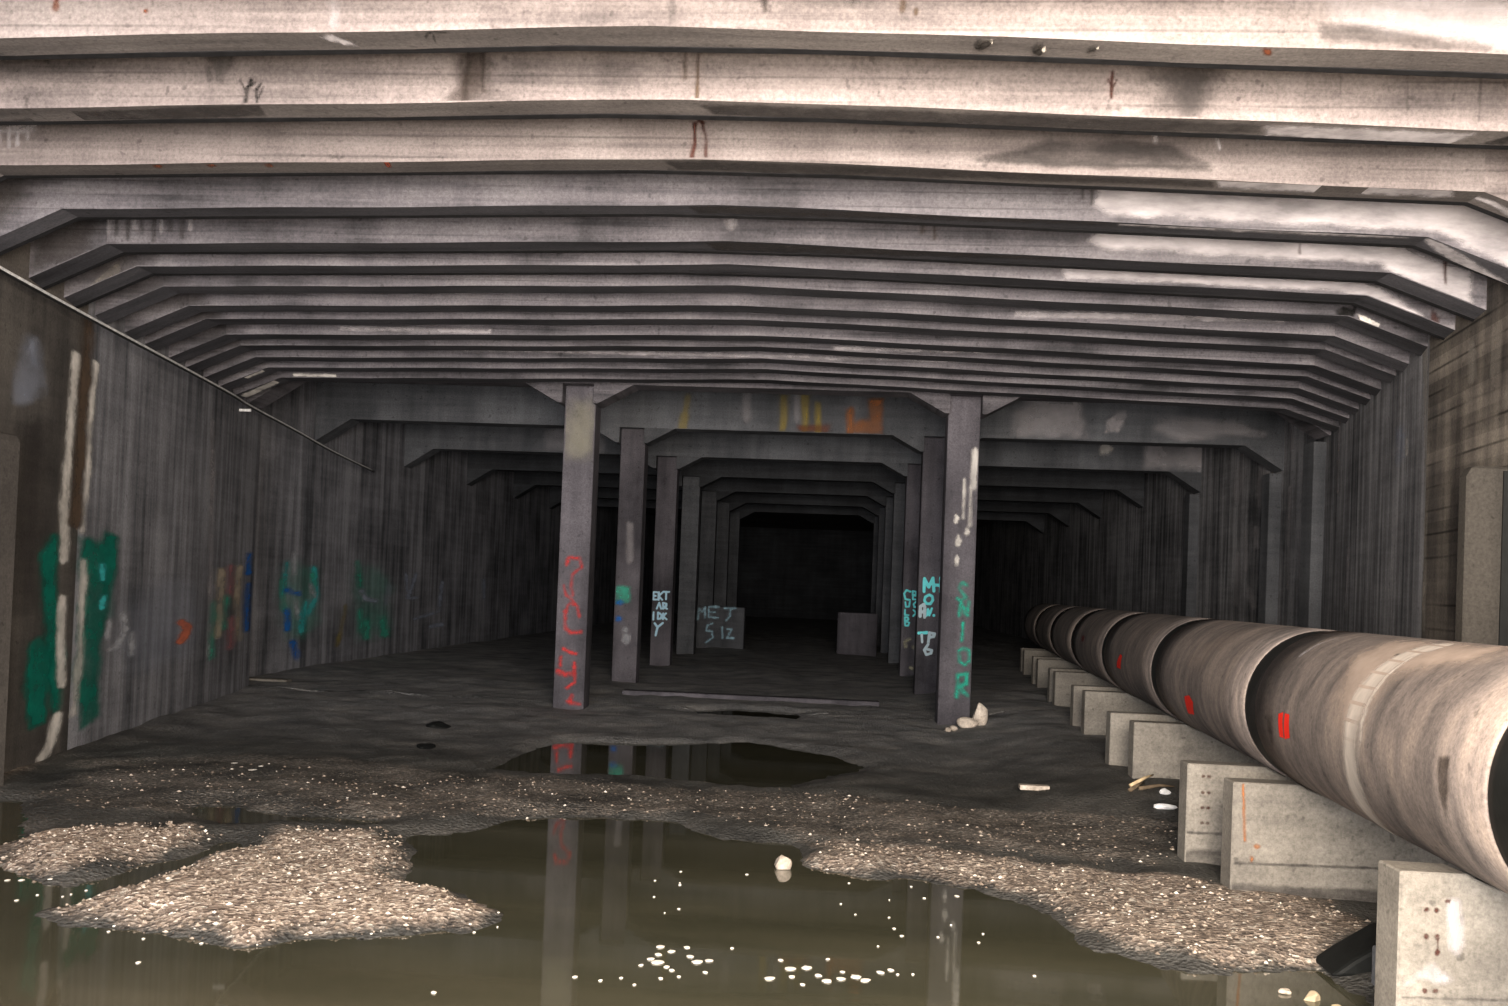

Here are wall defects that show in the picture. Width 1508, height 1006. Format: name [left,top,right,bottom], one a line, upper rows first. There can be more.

corrosion [690,120,707,158]